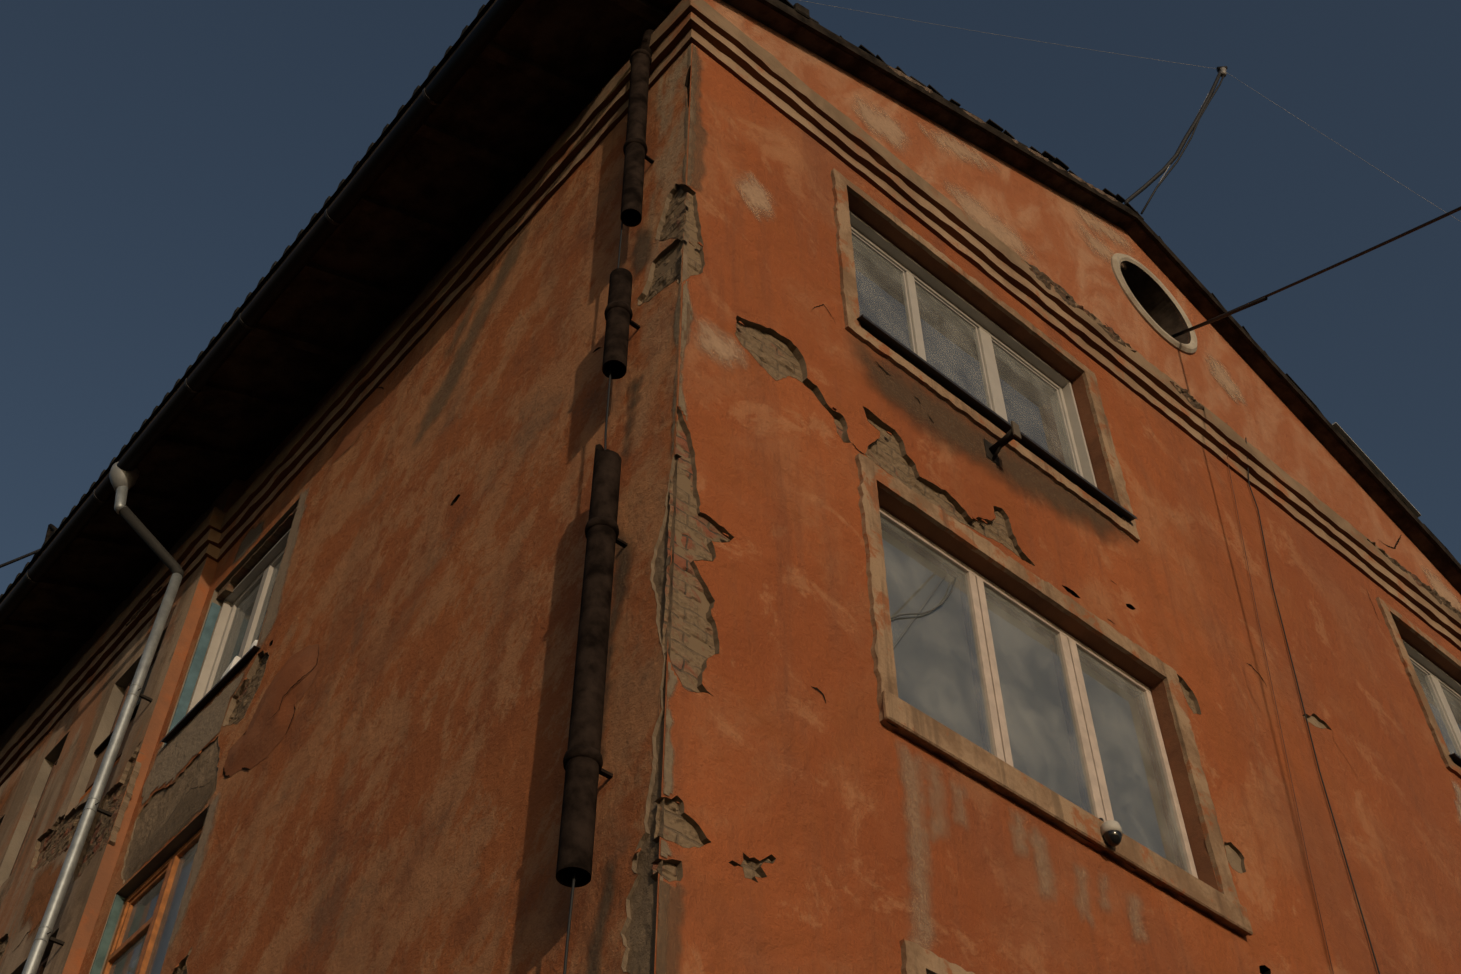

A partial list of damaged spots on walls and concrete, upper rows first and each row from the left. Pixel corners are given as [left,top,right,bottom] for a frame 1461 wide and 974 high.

spalling [620,45,734,974]